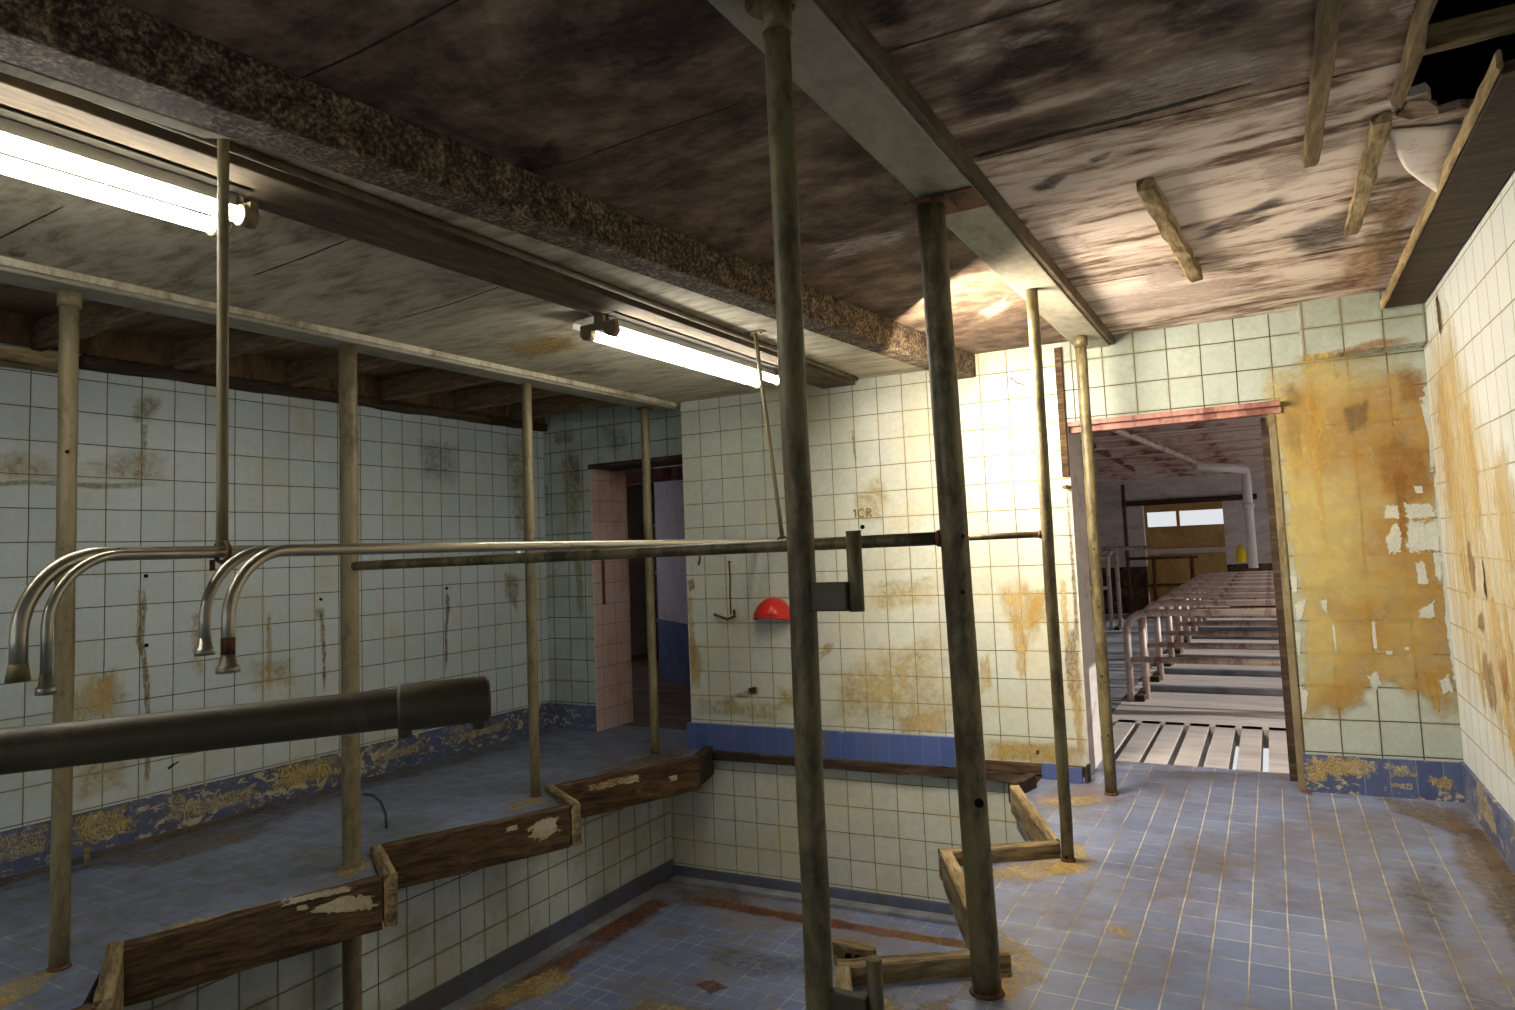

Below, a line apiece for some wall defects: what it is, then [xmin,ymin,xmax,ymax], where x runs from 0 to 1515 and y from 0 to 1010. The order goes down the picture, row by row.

damp [957,22,1093,113]
damp [1035,177,1064,191]
damp [1205,200,1278,238]
damp [1284,190,1412,286]
peeling [1384,379,1456,694]
rust [137,574,150,713]
peeling [1290,575,1337,655]
peeling [1305,755,1456,790]
peeling [281,886,352,911]
spalling [362,775,801,1010]
spalling [829,886,953,915]
spalling [124,942,343,1010]